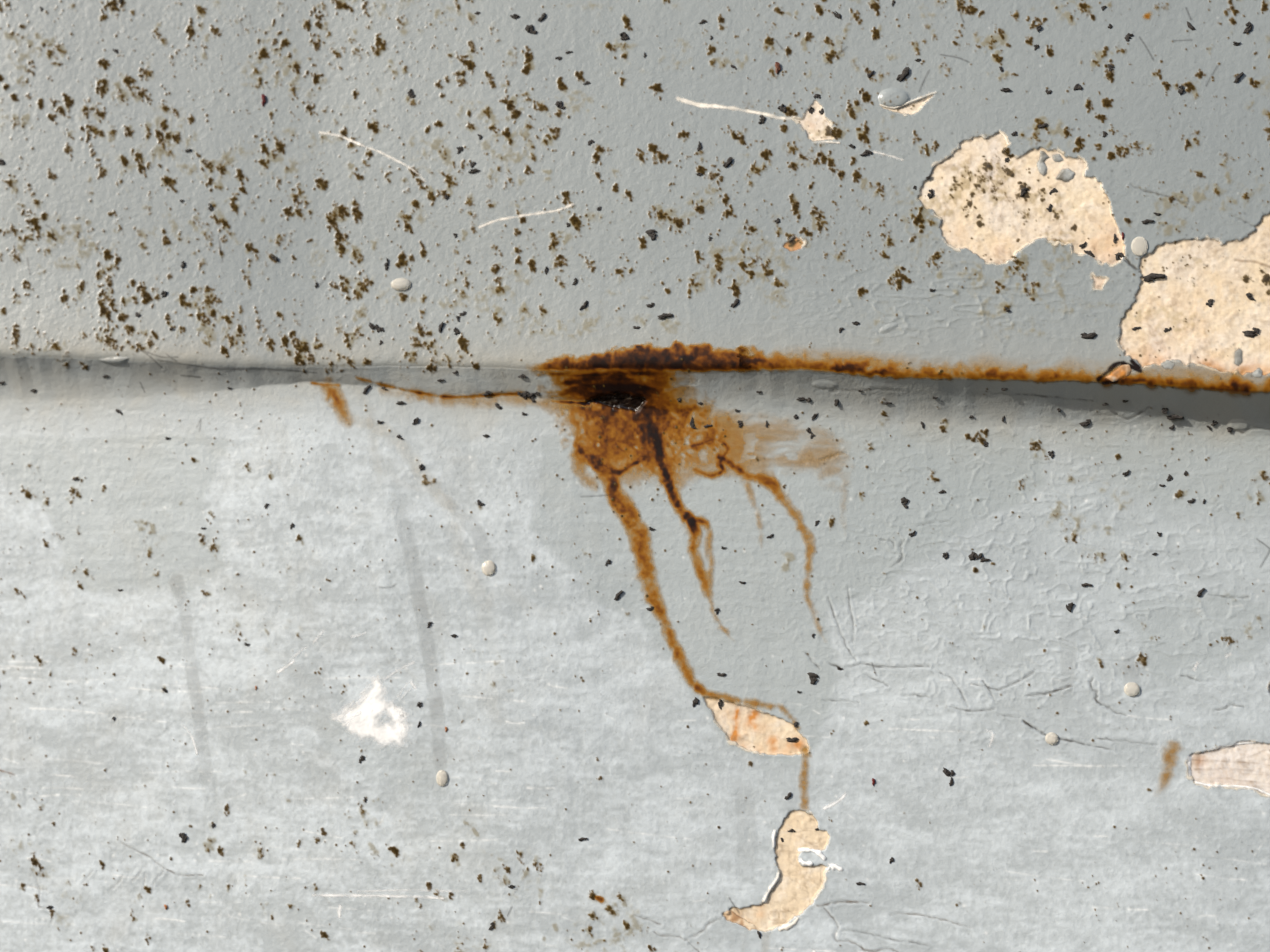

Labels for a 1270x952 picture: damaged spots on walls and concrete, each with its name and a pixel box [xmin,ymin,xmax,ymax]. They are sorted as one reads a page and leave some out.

peeling [792,101,840,143]
peeling [918,131,1125,289]
peeling [1105,214,1270,382]
corrosion [311,379,350,424]
corrosion [356,340,1270,725]
peeling [704,697,809,755]
corrosion [800,747,809,808]
corrosion [1162,743,1178,784]
peeling [1186,741,1270,796]
peeling [723,810,843,931]